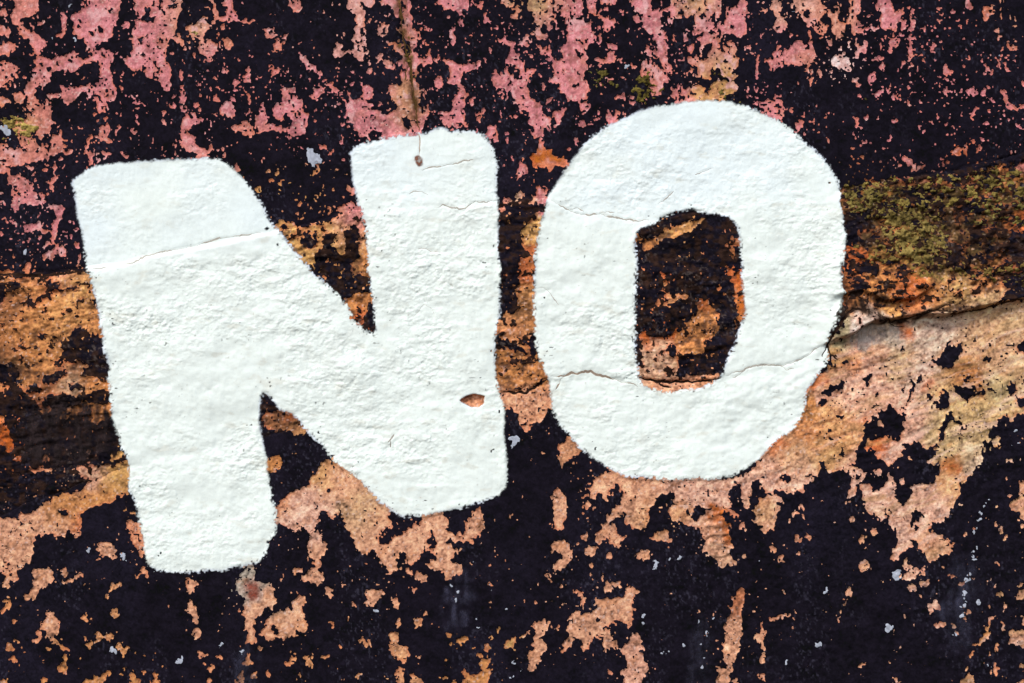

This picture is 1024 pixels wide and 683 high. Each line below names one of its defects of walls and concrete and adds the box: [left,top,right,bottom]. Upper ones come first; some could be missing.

crack [0,232,261,279]
spalling [0,0,1024,439]
crack [503,298,1024,395]
peeling [541,114,1024,598]
peeling [0,415,130,619]
peeling [218,408,503,683]
peeling [32,610,81,675]
peeling [82,631,163,683]
peeling [179,576,223,683]
peeling [504,573,656,683]
peeling [698,587,797,683]
peeling [960,580,1024,683]